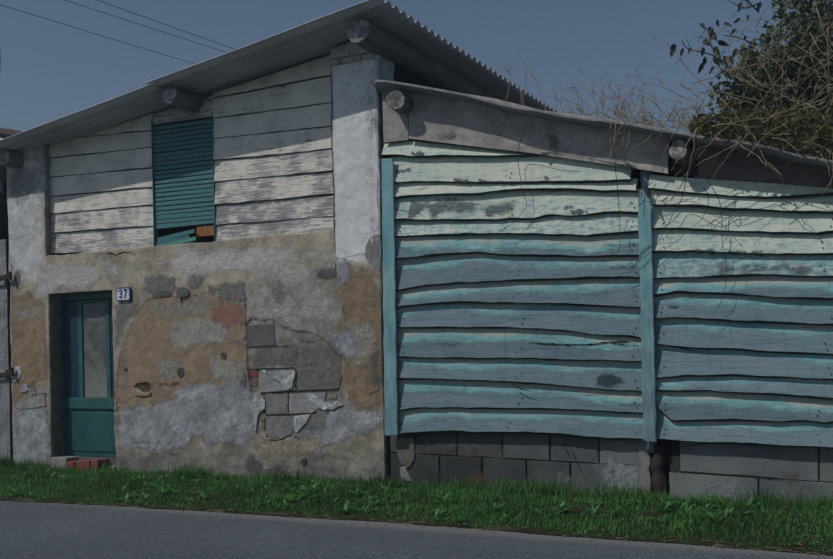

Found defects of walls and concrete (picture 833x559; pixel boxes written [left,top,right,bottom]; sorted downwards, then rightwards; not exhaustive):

peeling [408,198,515,218]
peeling [305,234,383,410]
peeling [114,290,296,433]
peeling [293,415,311,432]
flaking render [396,438,416,481]